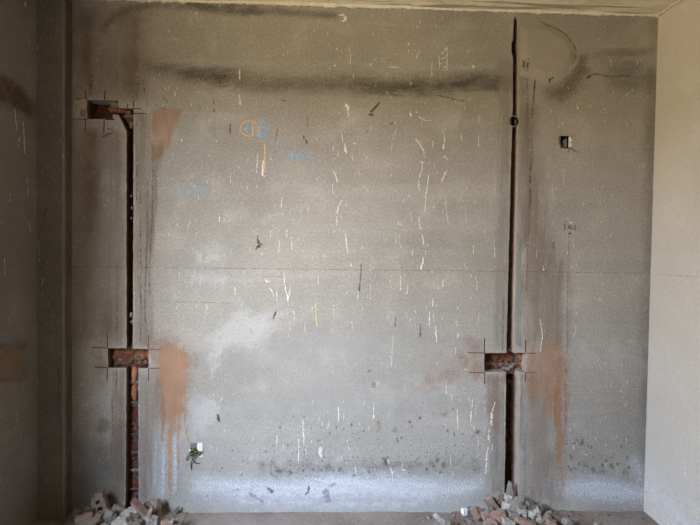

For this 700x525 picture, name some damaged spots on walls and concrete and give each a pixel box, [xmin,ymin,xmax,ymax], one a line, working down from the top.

corrosion [159,343,188,500]